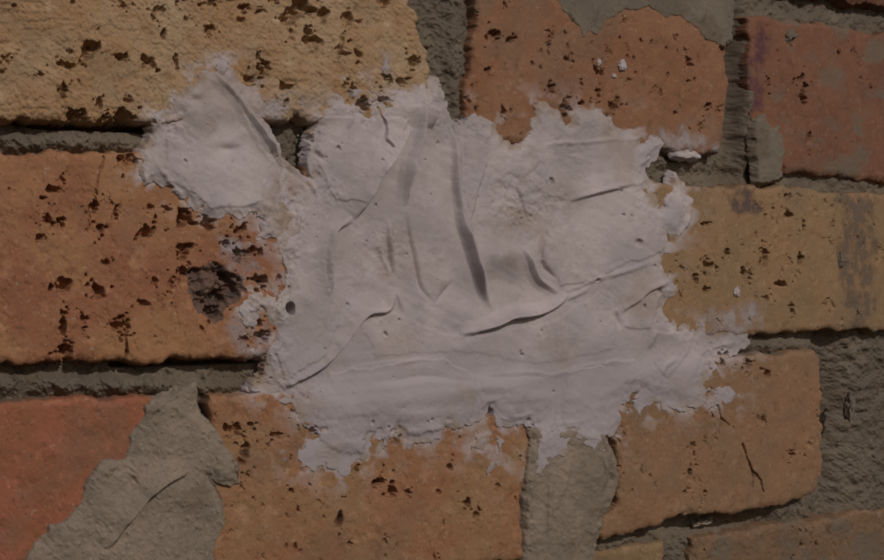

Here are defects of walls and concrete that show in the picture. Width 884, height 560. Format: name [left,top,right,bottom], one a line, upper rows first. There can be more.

spalling [558,92,573,118]
spalling [608,96,625,114]
peeling [664,149,701,163]
spalling [133,207,274,324]
spalling [699,256,720,277]